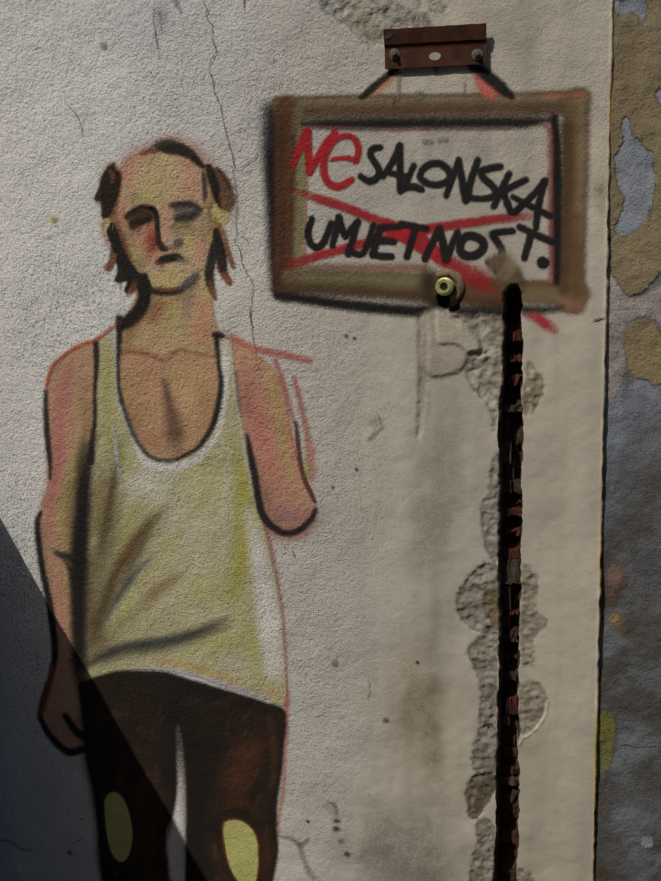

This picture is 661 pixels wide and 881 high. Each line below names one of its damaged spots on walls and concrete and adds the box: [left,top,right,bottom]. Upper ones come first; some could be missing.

spalling [320,0,445,45]
crack [203,1,261,371]
peeling [607,0,661,297]
spalling [451,312,504,432]
spalling [522,362,544,415]
peeling [620,319,661,415]
spalling [520,565,546,666]
spalling [456,452,501,881]
spalling [517,682,548,745]
spalling [517,869,532,881]